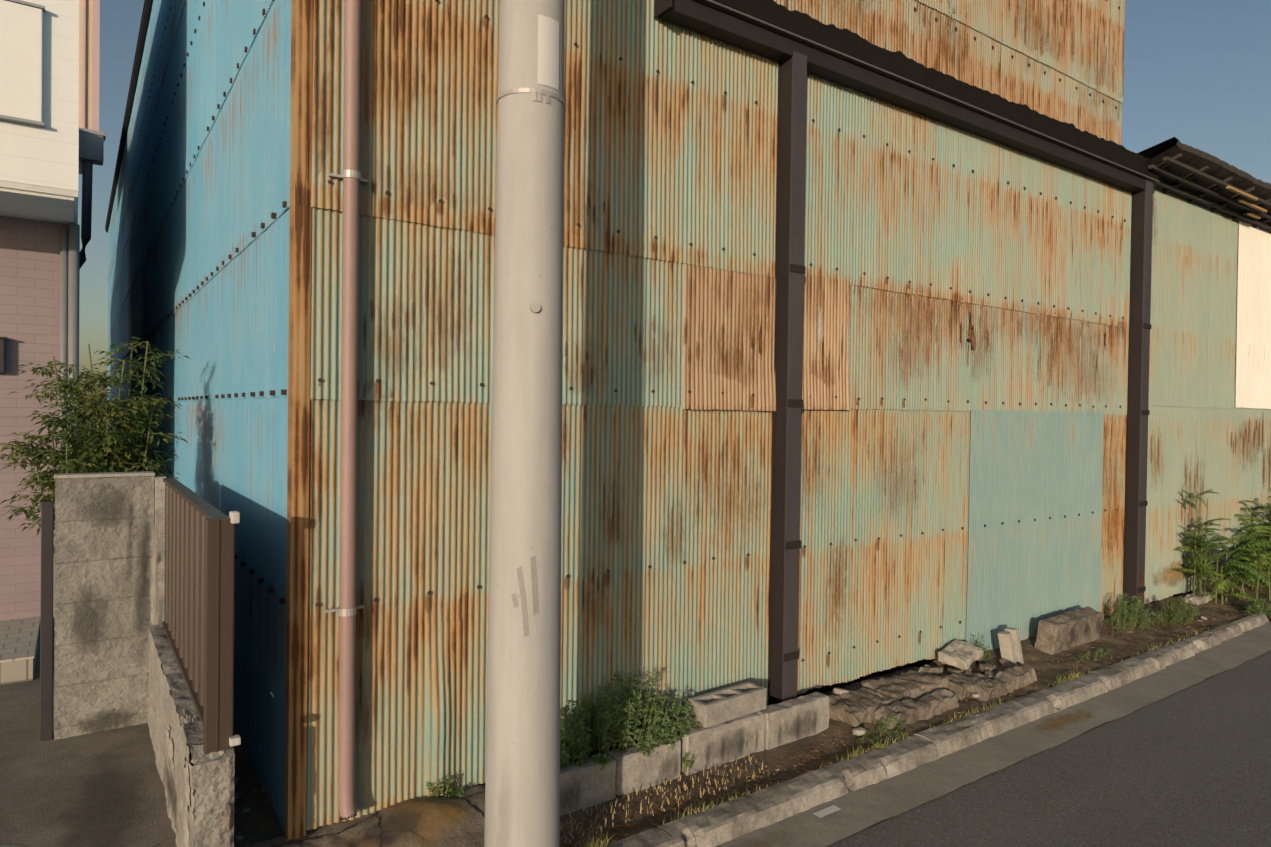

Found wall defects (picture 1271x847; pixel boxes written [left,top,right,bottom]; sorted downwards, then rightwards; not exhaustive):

rust [306,0,333,179]
rust [374,59,423,95]
rust [917,2,968,59]
rust [1009,0,1124,116]
rust [371,167,390,211]
rust [364,251,471,358]
rust [722,327,762,374]
rust [822,341,843,386]
rust [685,440,771,519]
rust [1231,422,1271,485]
crack [272,812,428,847]
crack [446,792,485,817]